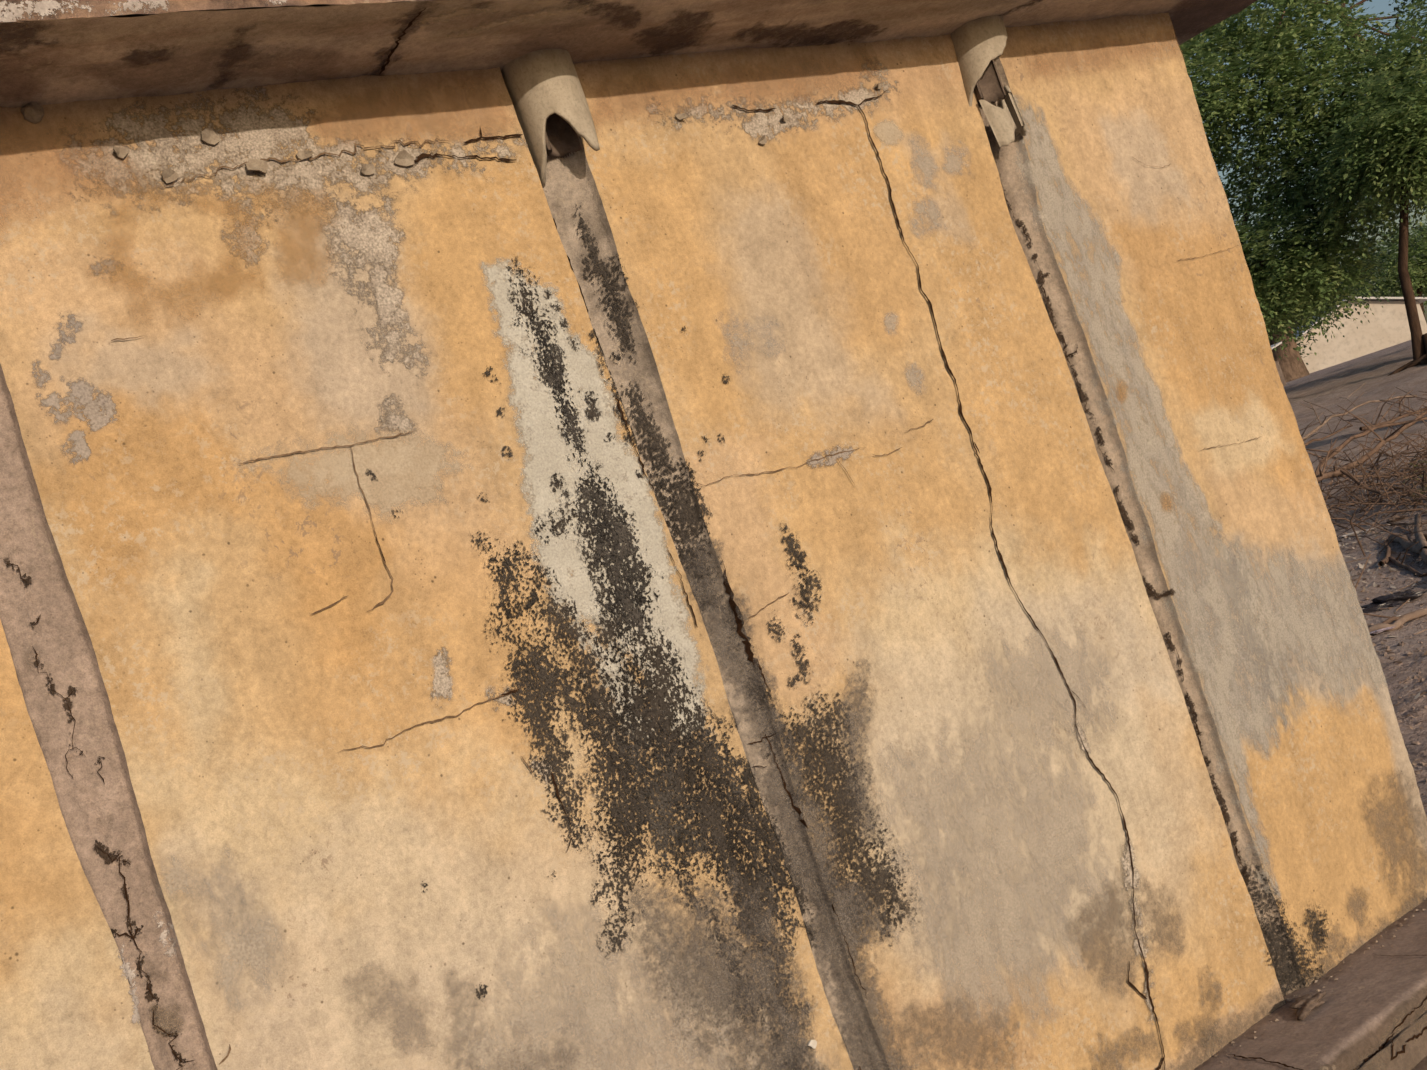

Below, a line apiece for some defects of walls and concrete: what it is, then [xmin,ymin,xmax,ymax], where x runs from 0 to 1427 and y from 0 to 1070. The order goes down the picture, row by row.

damp [0,0,169,52]
peeling [59,87,528,376]
peeling [646,60,898,145]
crack [3,558,105,784]
peeling [246,394,461,516]
peeling [481,259,706,744]
damp [466,204,1135,1070]
crack [694,95,1165,1070]
crack [995,161,1250,886]
damp [1013,96,1427,1070]
crack [94,839,231,1070]
damp [453,984,488,999]